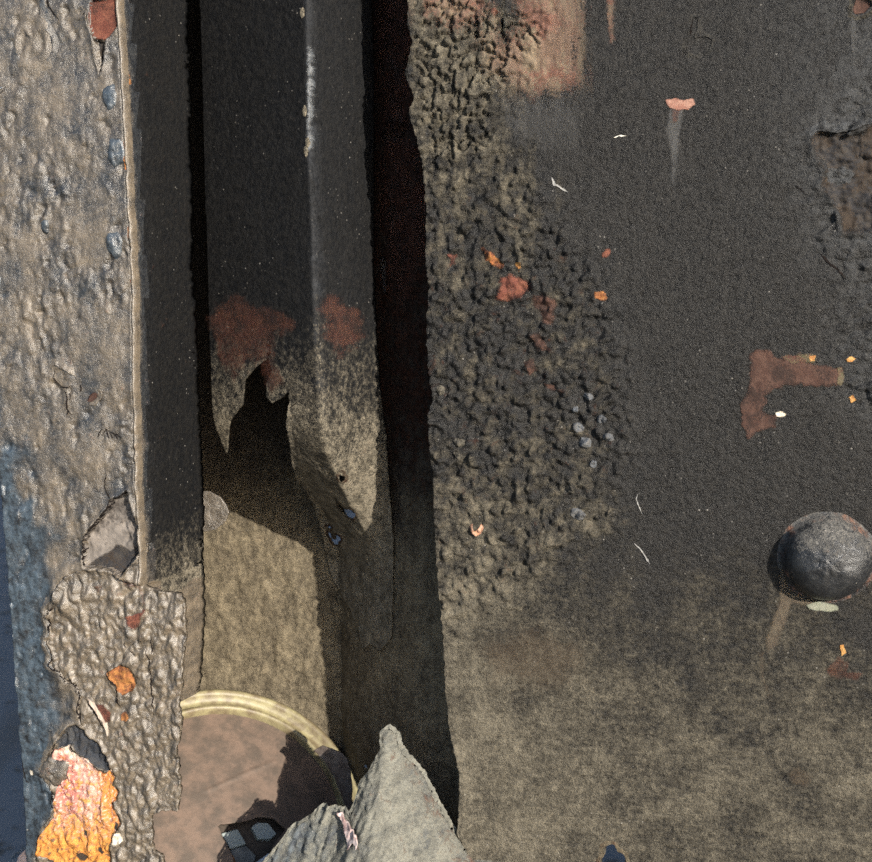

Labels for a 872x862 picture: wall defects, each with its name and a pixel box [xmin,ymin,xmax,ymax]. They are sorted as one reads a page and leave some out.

crack [40,0,58,19]
rust [482,247,557,324]
crack [50,359,82,416]
rust [740,349,844,439]
spalling [48,477,149,610]
crack [22,589,81,809]
spalling [56,725,110,771]
peeling [87,699,110,736]
rust [35,745,123,862]